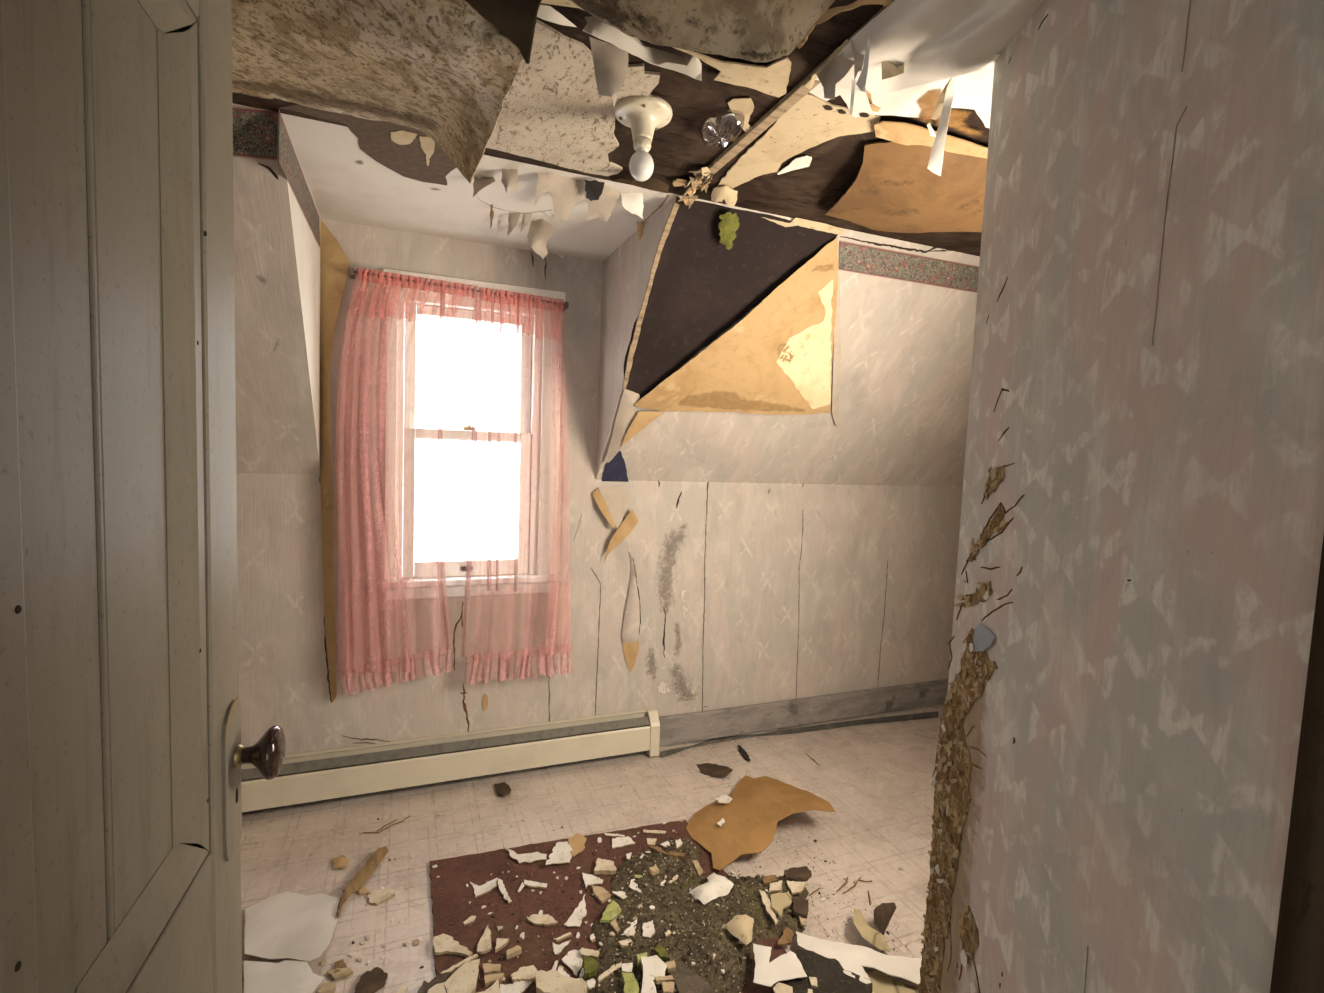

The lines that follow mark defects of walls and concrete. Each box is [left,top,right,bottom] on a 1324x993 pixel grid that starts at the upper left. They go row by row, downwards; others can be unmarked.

mould [569,0,660,33]
peeling [279,104,456,190]
peeling [592,197,838,563]
crack [453,602,469,732]
peeling [622,640,639,672]
spalling [919,463,1024,993]